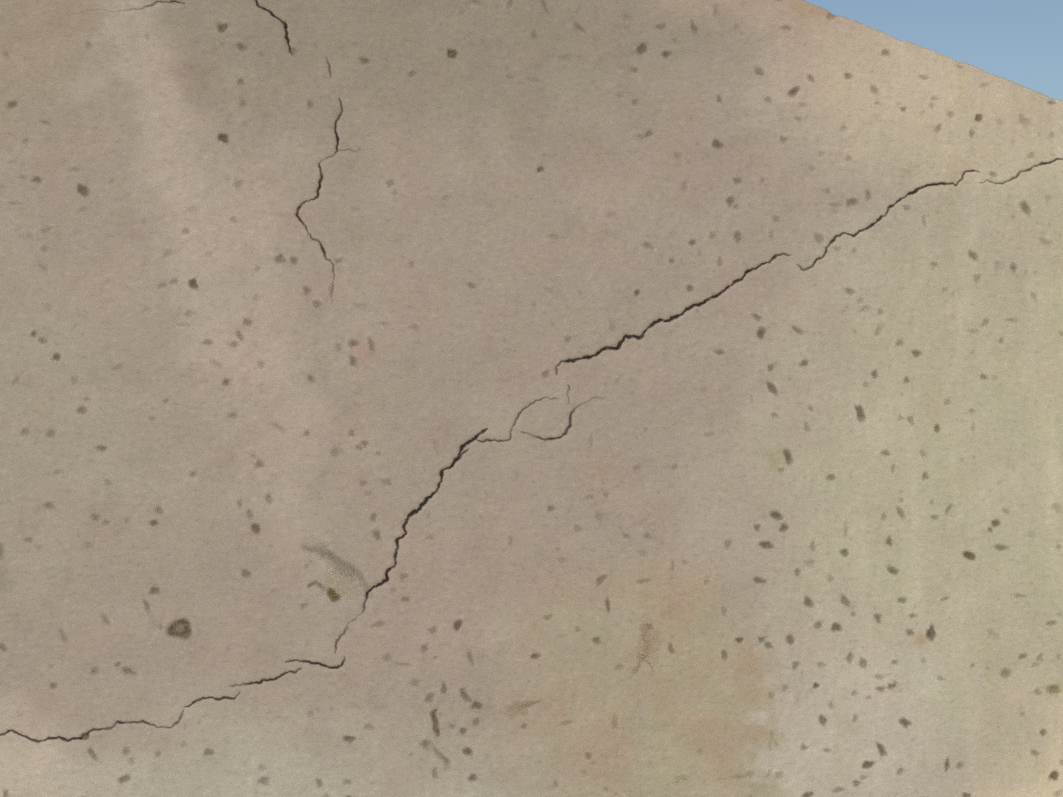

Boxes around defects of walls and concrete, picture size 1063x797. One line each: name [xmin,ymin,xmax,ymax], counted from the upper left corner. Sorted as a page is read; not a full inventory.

crack [255,0,291,51]
crack [296,98,342,256]
crack [559,158,1062,364]
crack [363,403,533,606]
crack [538,411,573,440]
crack [0,644,345,742]